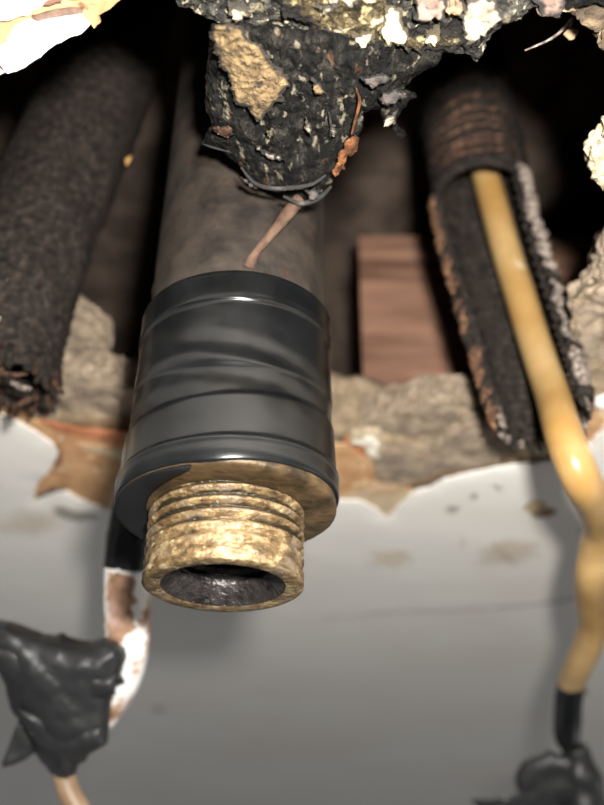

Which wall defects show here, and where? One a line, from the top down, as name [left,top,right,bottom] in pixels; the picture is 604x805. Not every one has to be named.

peeling [0,0,119,74]
spalling [533,0,604,50]
spalling [584,116,604,190]
spalling [1,295,139,508]
spalling [331,371,551,517]
spalling [566,230,604,442]